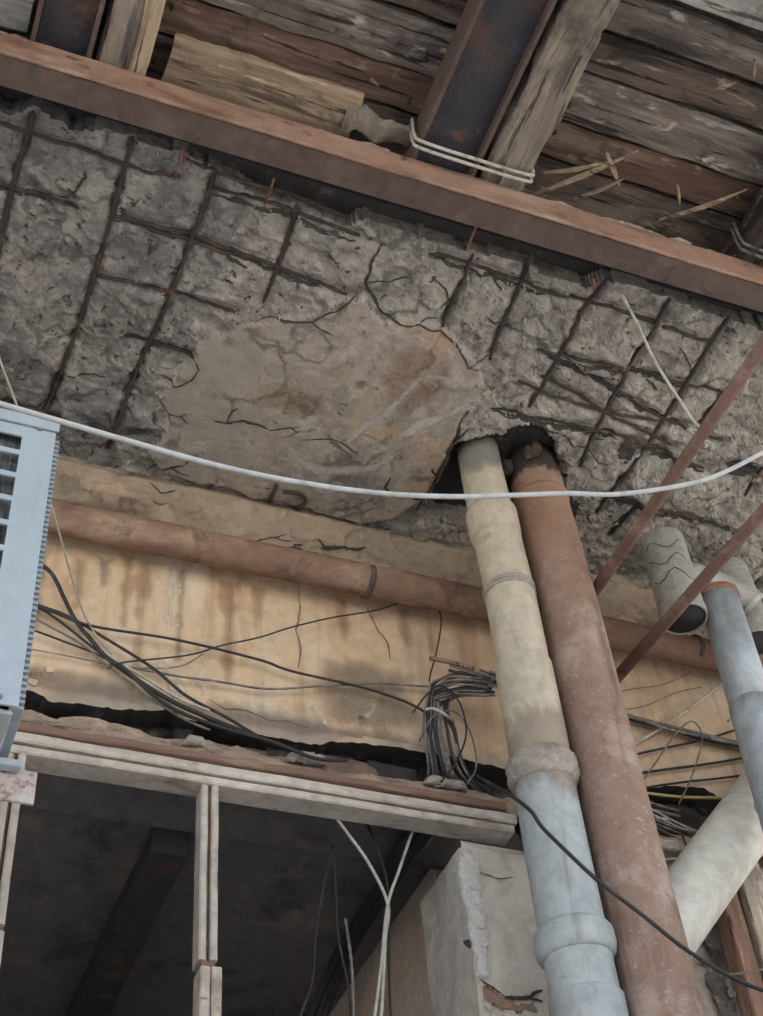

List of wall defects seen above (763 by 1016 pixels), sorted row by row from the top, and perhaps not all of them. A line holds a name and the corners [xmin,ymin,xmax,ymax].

spalling [0,95,763,589]
corrosion [501,459,514,493]
corrosion [524,440,542,459]
corrosion [555,452,568,486]
crack [256,534,365,553]
spalling [733,523,763,603]
leakage [153,662,185,704]
leakage [332,667,403,743]
peeling [458,846,537,1016]